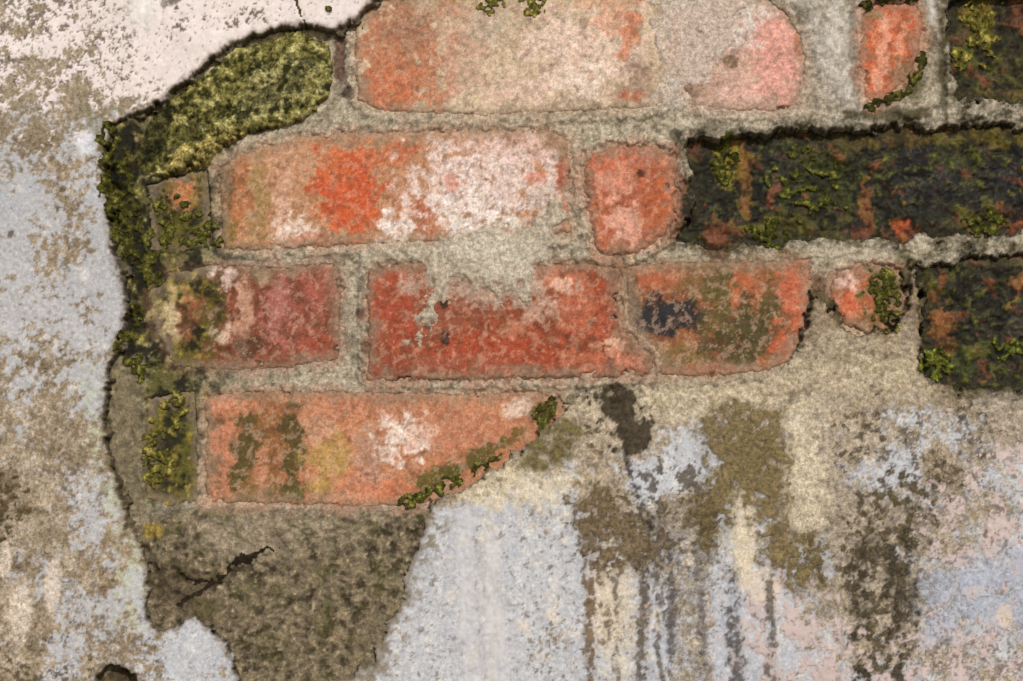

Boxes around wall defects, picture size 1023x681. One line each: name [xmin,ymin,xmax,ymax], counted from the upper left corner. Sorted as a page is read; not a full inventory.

crack [294,0,308,30]
spalling [107,0,1023,526]
spalling [99,665,137,681]
spalling [133,491,442,681]
water stain [522,418,583,471]
water stain [563,381,964,681]
peeling [747,538,860,681]
peeling [914,472,1023,681]